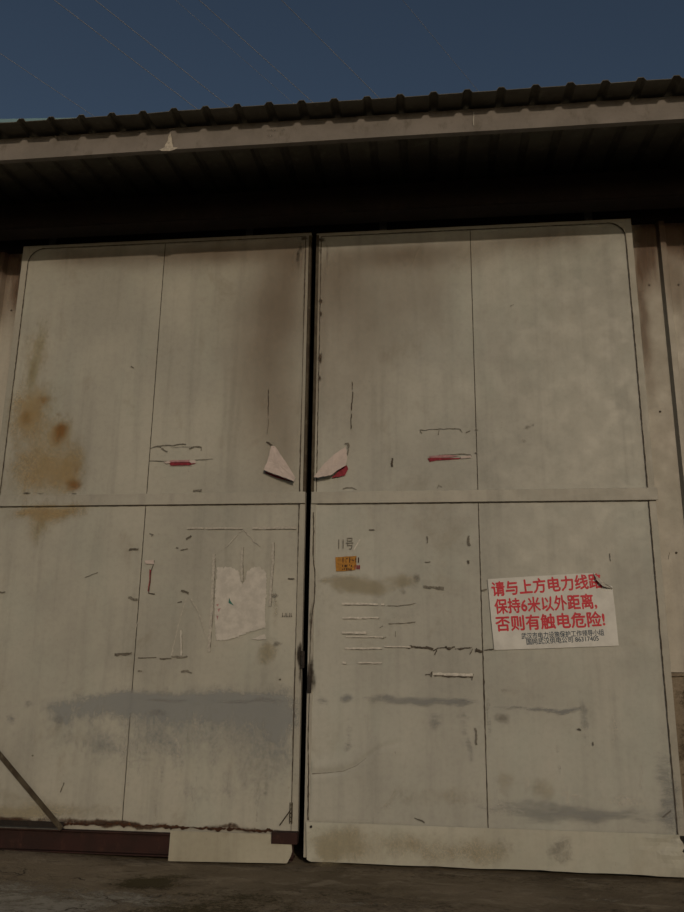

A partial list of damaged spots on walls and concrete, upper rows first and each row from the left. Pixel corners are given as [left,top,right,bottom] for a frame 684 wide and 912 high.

rust [60,819,273,833]